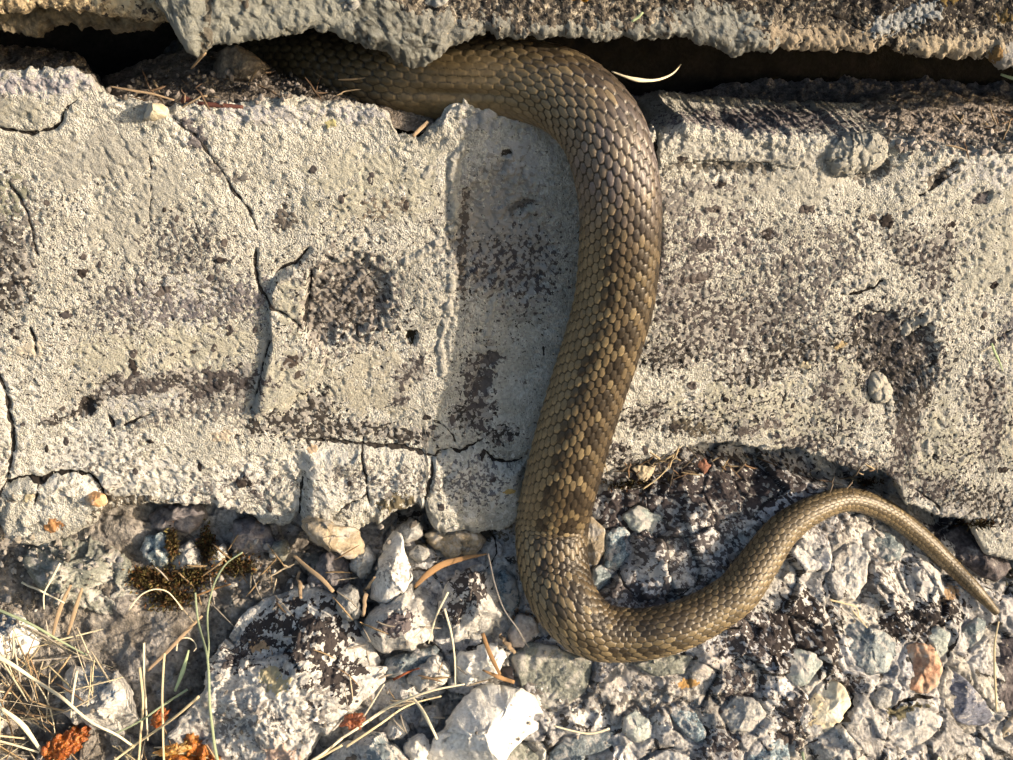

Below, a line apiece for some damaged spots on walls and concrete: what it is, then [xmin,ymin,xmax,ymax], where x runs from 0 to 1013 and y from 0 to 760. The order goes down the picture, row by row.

crack [827,13,864,31]
crack [889,37,898,50]
crack [0,100,77,136]
crack [147,156,155,222]
crack [10,184,39,255]
crack [174,117,313,330]
crack [29,327,37,351]
crack [250,340,271,410]
crack [0,374,105,505]
crack [108,414,151,431]
crack [297,476,305,514]